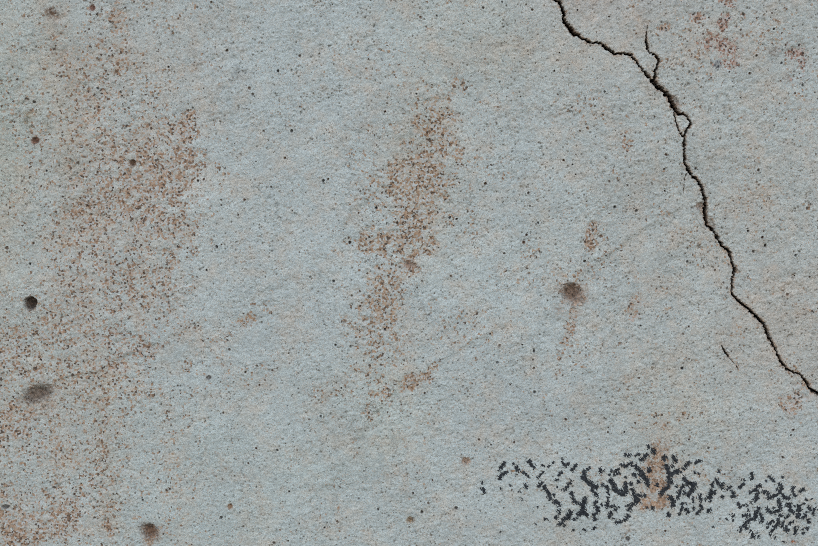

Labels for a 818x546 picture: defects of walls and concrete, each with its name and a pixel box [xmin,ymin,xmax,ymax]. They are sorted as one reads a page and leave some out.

crack [549,0,818,399]